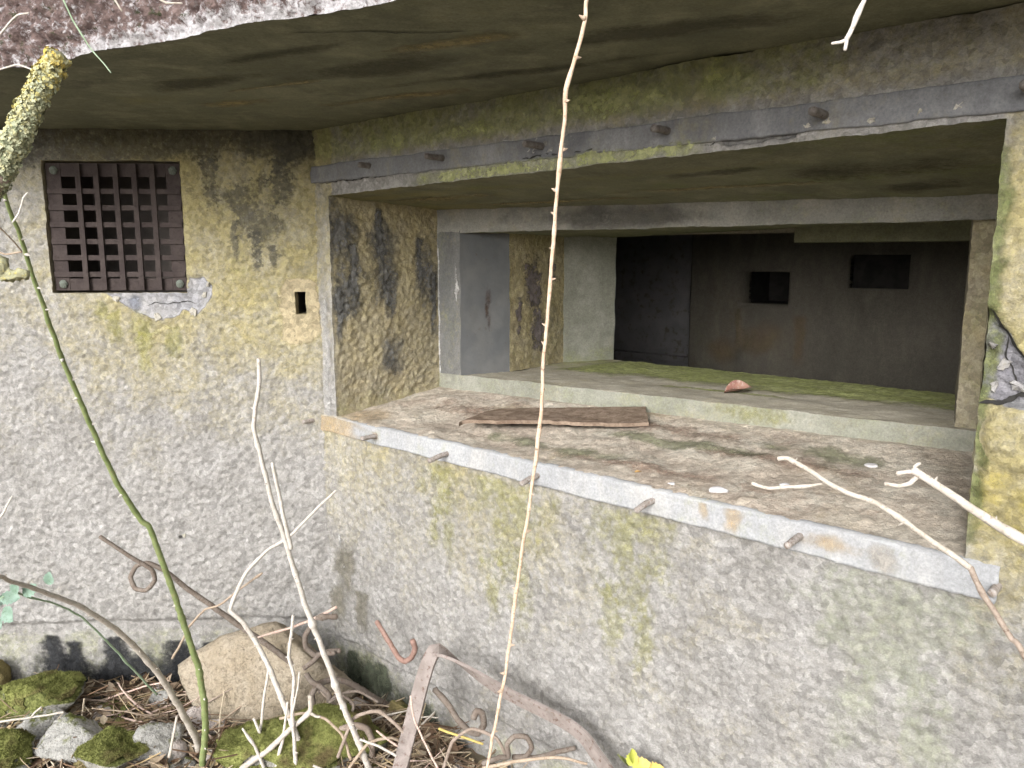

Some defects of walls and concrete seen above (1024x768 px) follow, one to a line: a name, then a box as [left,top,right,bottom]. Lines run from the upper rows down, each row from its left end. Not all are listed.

spalling [107,277,212,322]
leakage [322,199,398,347]
leakage [415,238,441,373]
leakage [383,341,403,375]
spalling [978,309,1024,405]